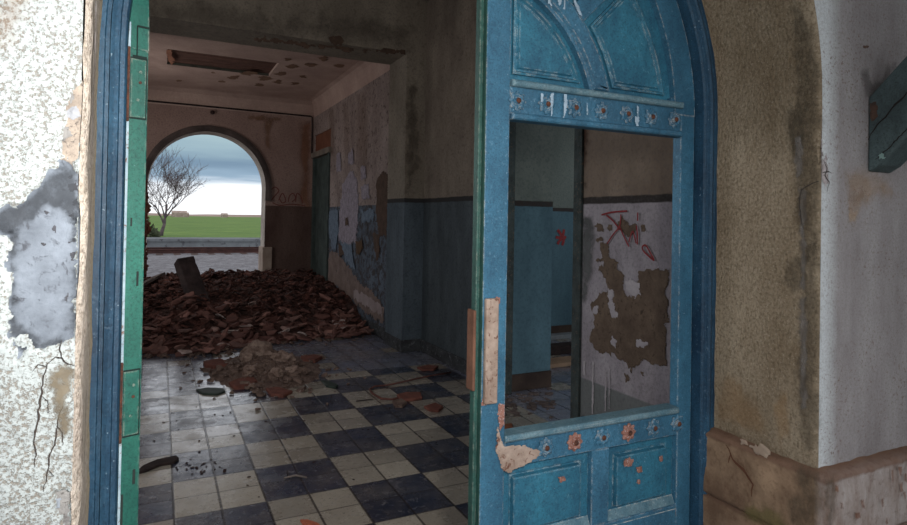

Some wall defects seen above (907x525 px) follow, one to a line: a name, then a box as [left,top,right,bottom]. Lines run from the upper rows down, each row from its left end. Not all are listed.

spalling [0,0,97,359]
spalling [136,179,152,286]
peeling [328,149,388,324]
peeling [589,216,669,382]
crack [33,340,75,492]
crack [726,445,754,497]
spalling [740,439,770,458]